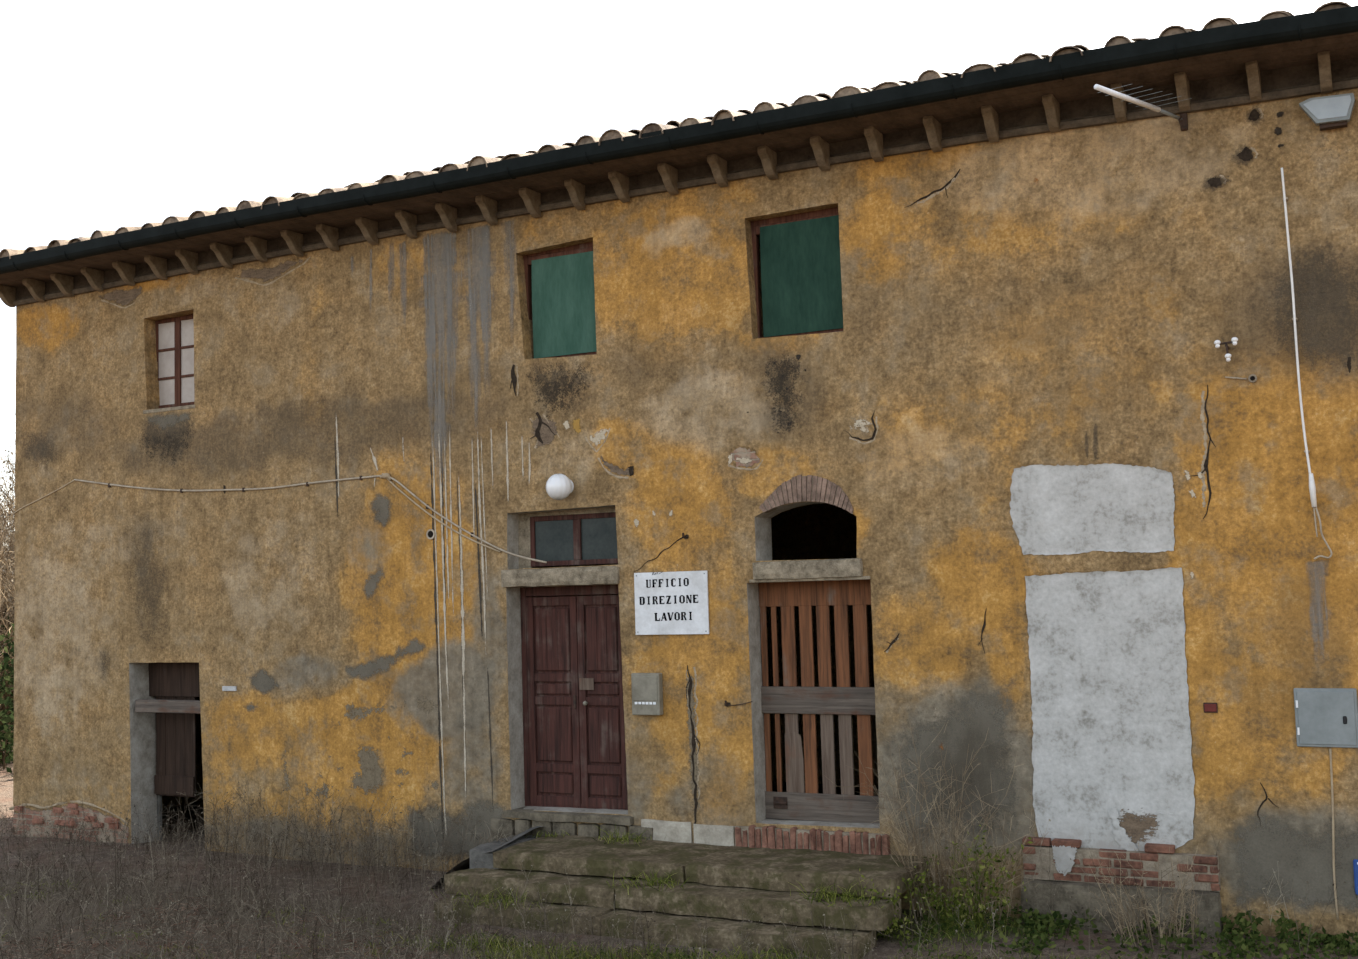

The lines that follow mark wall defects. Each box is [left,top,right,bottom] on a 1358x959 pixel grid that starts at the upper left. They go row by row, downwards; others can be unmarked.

crack [904,169,960,208]
damp [529,369,585,417]
spalling [597,456,634,479]
spalling [728,447,763,471]
crack [1192,385,1216,519]
peeling [371,494,390,527]
damp [408,221,531,858]
peeling [364,568,384,598]
peeling [346,638,425,679]
peeling [247,670,278,711]
crack [686,665,701,824]
peeling [329,736,412,795]